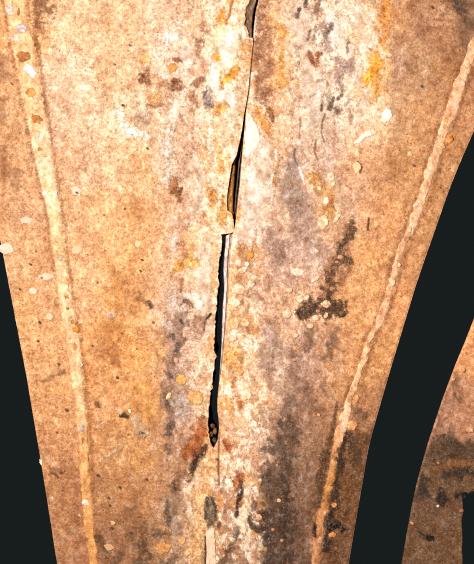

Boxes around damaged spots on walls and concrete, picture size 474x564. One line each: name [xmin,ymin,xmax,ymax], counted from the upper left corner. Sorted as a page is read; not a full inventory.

rust [362,0,391,104]
leakage [281,140,333,215]
crack [207,0,258,484]
leakage [263,230,285,263]
leakage [322,326,340,362]
rust [180,407,208,462]
leakage [247,331,325,564]
leakage [312,381,368,564]
leakage [416,474,465,507]
leakage [426,434,474,482]